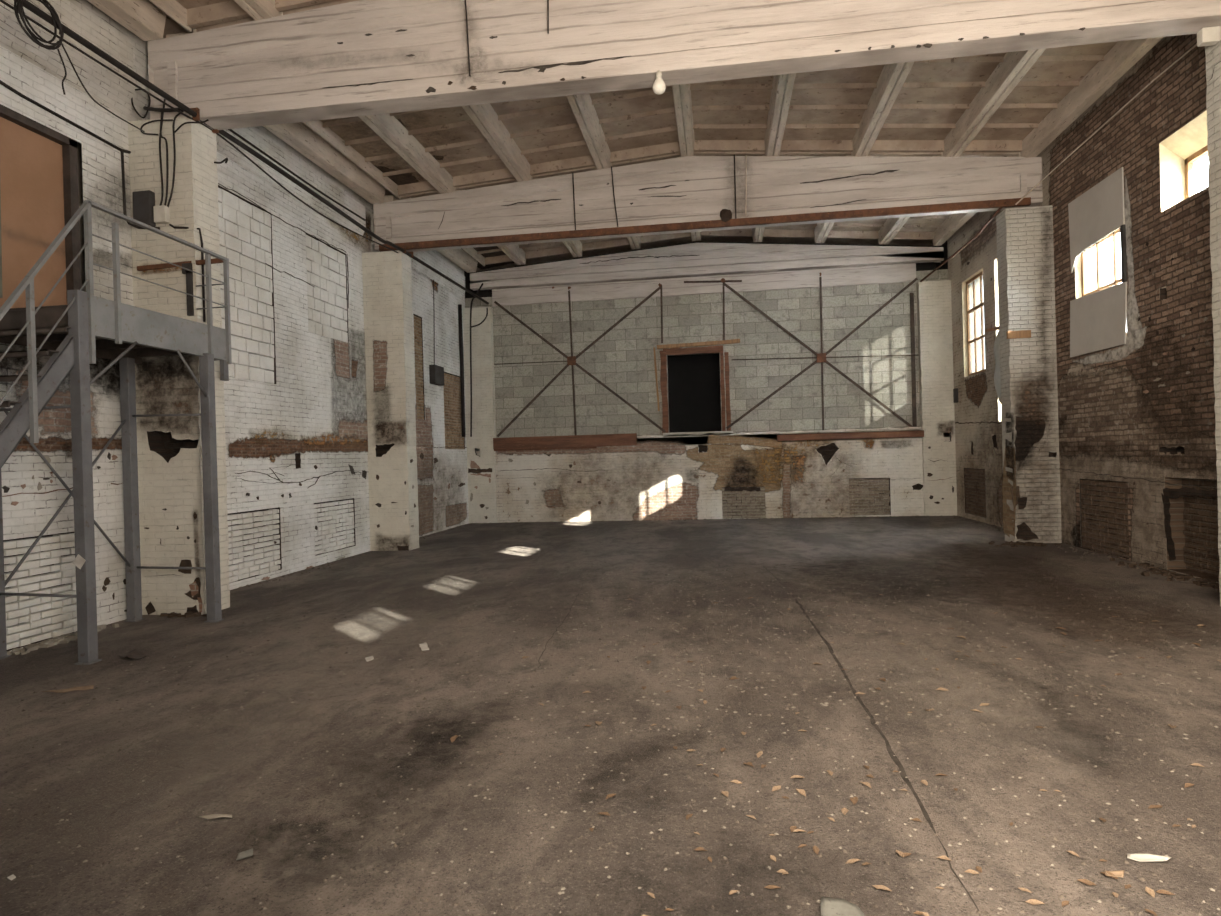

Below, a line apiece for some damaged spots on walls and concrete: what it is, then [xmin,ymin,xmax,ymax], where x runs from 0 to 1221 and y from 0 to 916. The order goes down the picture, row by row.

peeling [1048,34,1217,471]
spalling [147,431,199,463]
peeling [332,331,492,536]
flaking render [633,435,794,520]
crack [765,567,980,915]